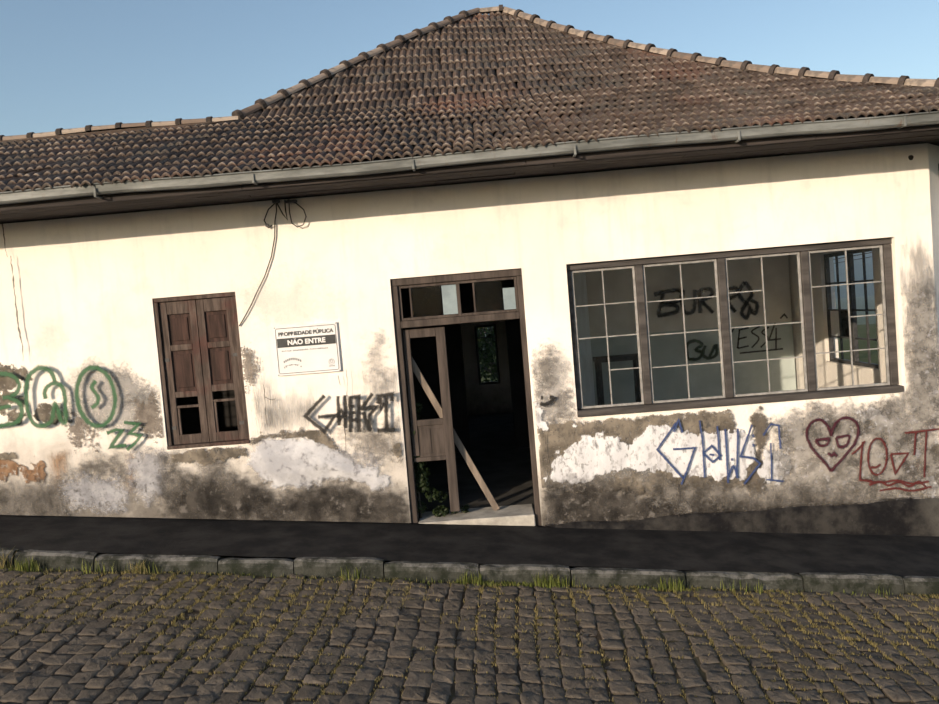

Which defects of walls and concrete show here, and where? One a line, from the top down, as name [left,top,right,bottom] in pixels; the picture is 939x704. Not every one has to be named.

crack [2,222,23,352]
peeling [0,452,47,483]
peeling [0,364,102,452]
peeling [126,392,164,443]
water stain [0,448,407,523]
water stain [343,419,403,461]
peeling [533,402,787,500]
water stain [542,251,939,527]